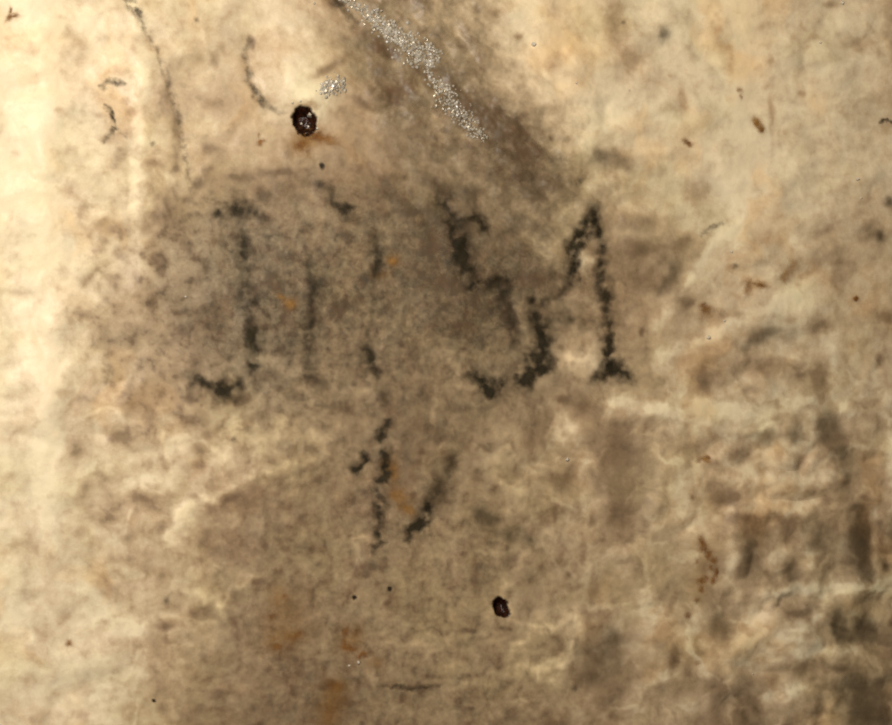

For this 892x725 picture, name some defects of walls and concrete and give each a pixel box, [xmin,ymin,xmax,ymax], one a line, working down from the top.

leakage [355,0,573,211]
leakage [229,423,522,725]
corrosion [699,539,718,591]